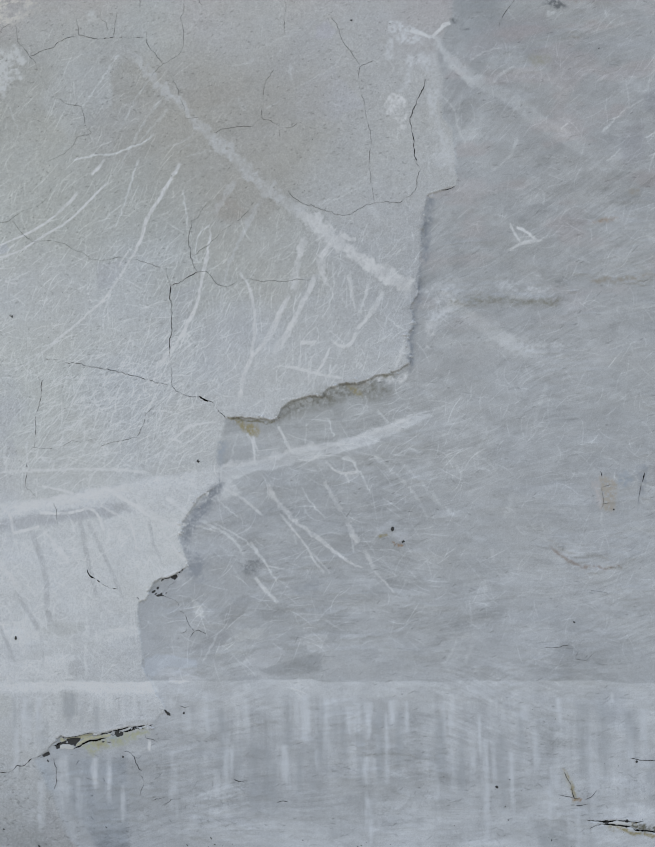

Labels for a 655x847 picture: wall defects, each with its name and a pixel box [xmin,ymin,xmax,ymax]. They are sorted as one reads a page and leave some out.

crack [291,83,425,216]
crack [47,205,303,417]
peeling [415,279,467,353]
peeling [492,278,560,303]
peeling [491,331,576,362]
peeling [589,462,650,515]
water stain [59,692,115,742]
water stain [37,754,142,847]
crack [1,725,181,802]
water stain [180,693,411,847]
flaking render [366,756,484,847]
water stain [430,692,655,847]